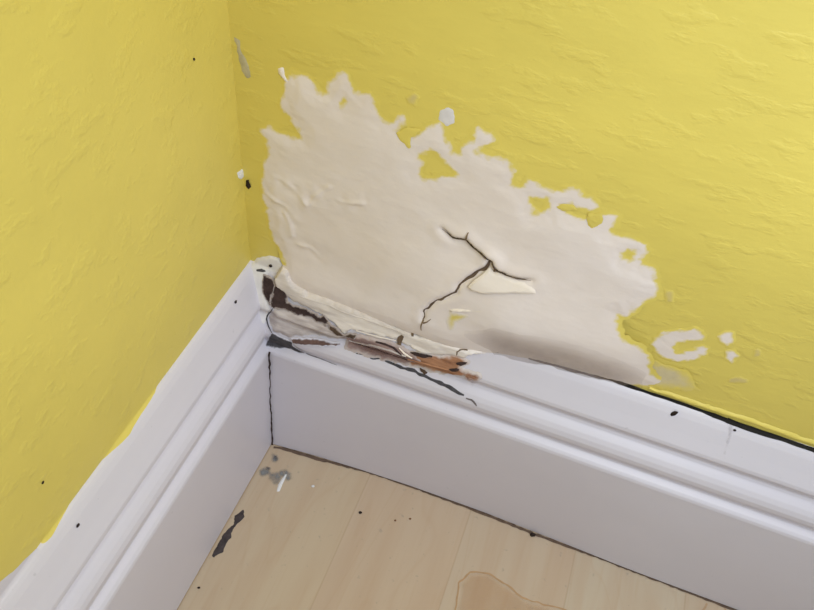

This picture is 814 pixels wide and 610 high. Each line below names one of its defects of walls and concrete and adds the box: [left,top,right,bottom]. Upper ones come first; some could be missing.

crack [356,229,531,406]
peeling [251,67,741,389]